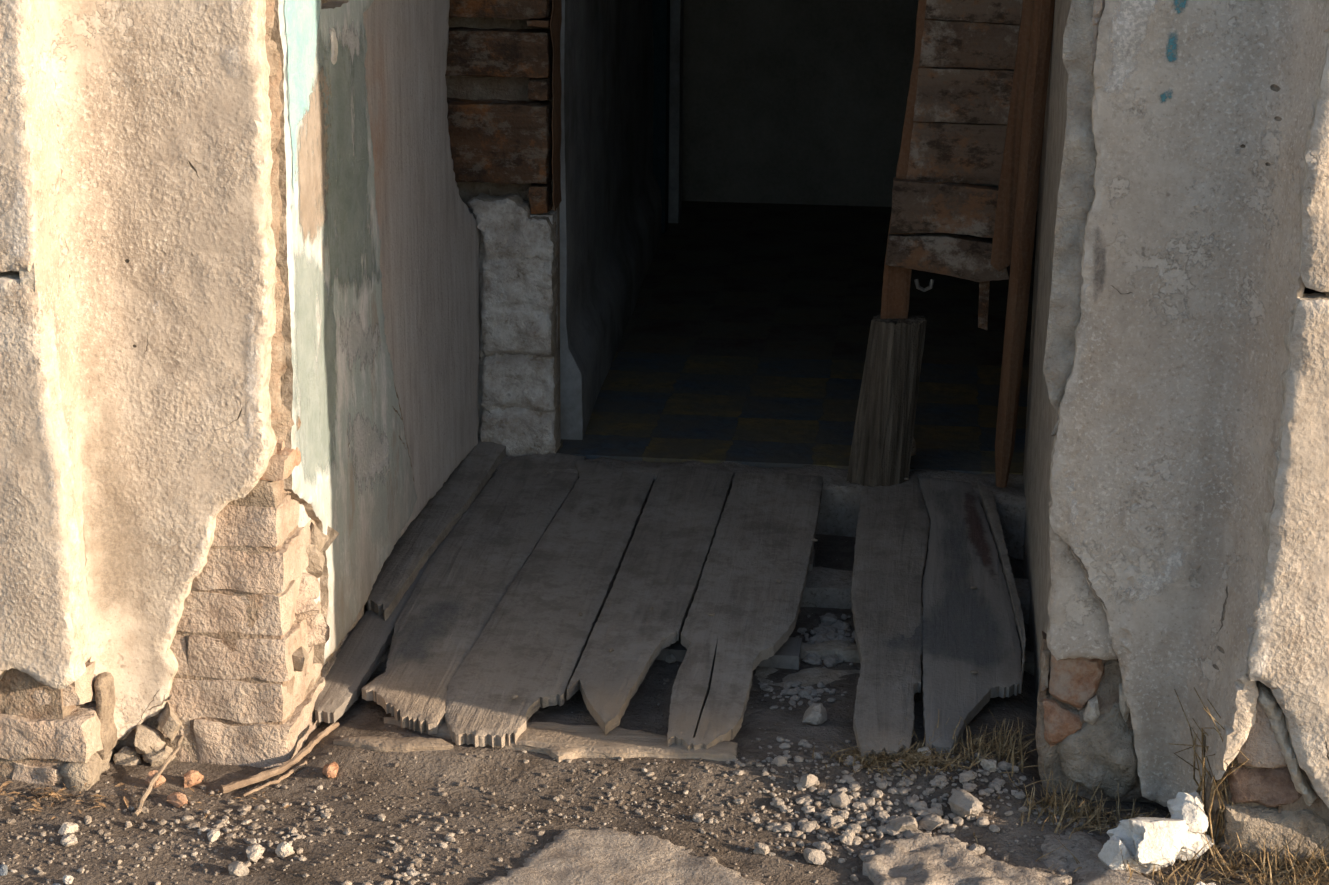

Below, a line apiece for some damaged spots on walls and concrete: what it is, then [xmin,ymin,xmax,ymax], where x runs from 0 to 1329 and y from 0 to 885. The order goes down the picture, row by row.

spalling [0,0,379,791]
spalling [1035,505,1146,802]
spalling [1201,680,1329,856]